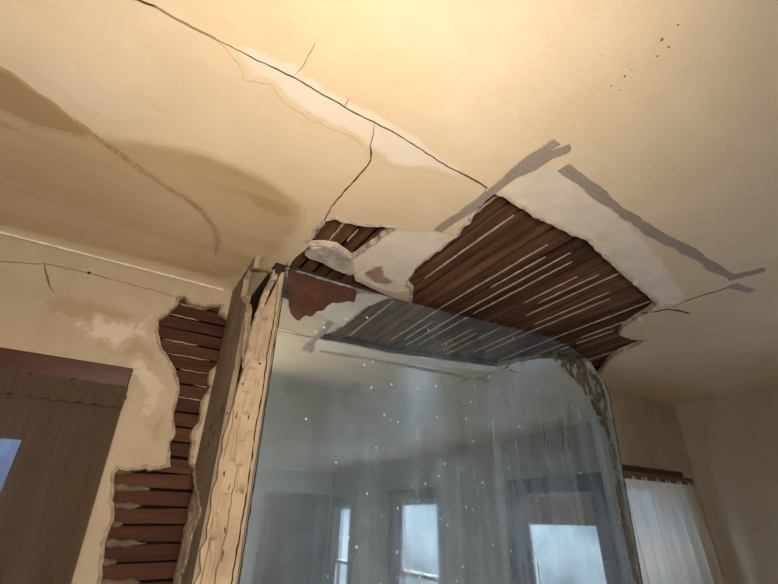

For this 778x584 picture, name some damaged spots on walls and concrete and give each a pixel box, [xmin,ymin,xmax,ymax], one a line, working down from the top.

leakage [0,66,313,283]
crack [138,0,487,221]
spalling [291,216,397,293]
spalling [406,139,766,375]
spalling [54,295,227,584]